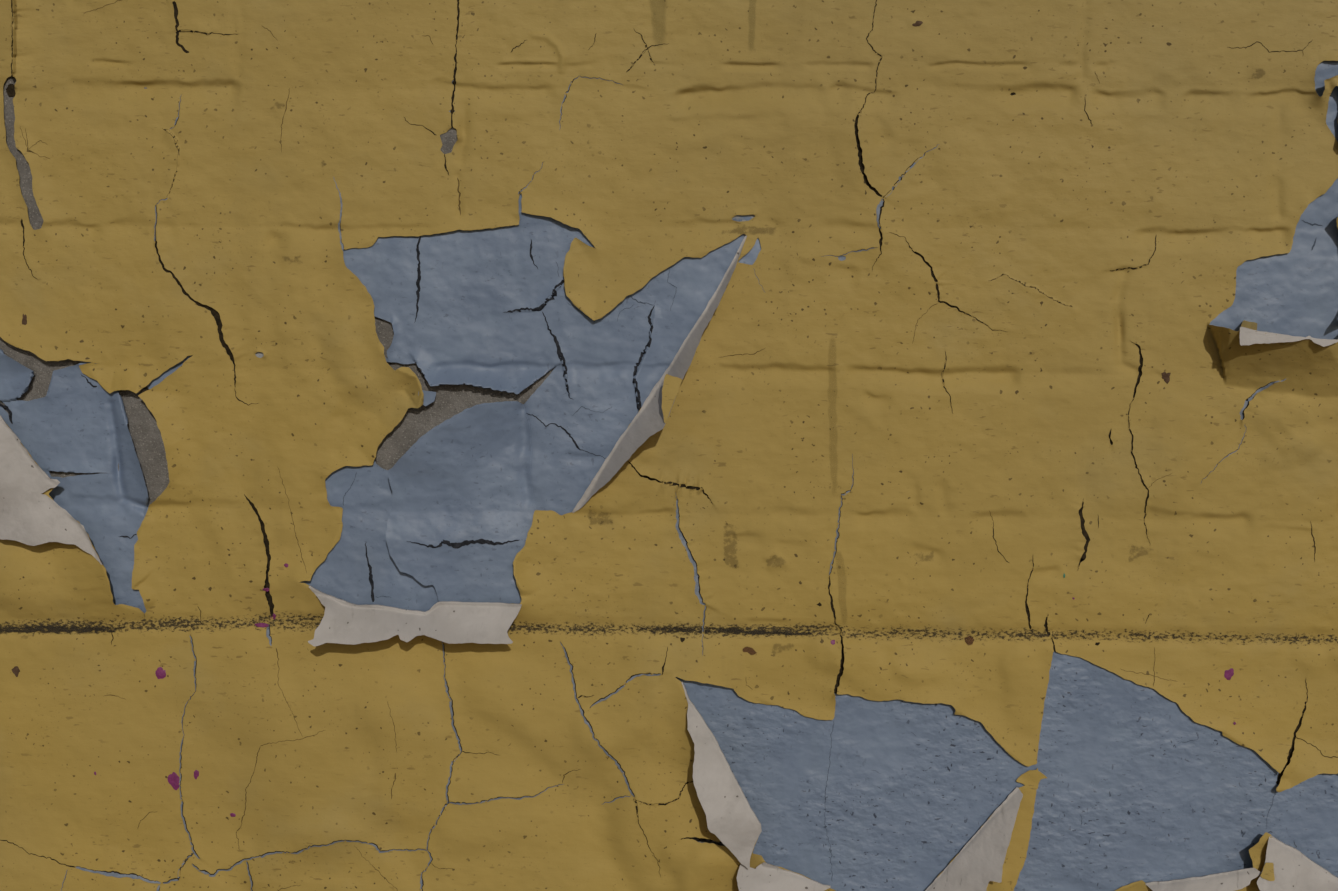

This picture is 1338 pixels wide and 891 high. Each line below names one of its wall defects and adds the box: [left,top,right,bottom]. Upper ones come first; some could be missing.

crack [154,96,258,405]
crack [404,0,461,215]
crack [821,0,1006,344]
peeling [1209,178,1338,347]
peeling [1314,61,1338,142]
peeling [0,337,193,614]
peeling [301,193,761,646]
crack [628,461,712,654]
crack [1109,342,1286,543]
crack [1,468,577,891]
crack [560,642,722,877]
peeling [675,651,1338,891]